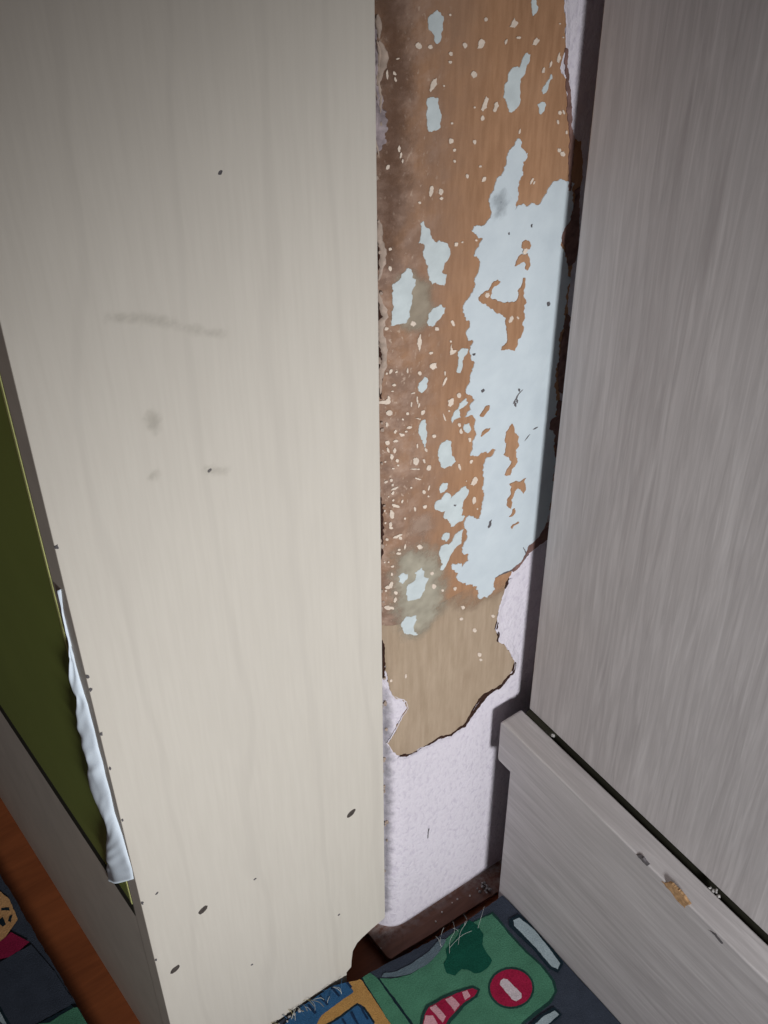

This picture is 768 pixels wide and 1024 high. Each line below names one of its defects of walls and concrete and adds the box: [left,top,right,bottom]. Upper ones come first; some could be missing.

spalling [375,15,400,85]
flaking render [415,10,451,49]
flaking render [426,78,453,132]
flaking render [473,37,540,121]
flaking render [537,52,561,115]
flaking render [377,129,581,611]
flaking render [401,615,418,635]
spalling [382,640,392,682]